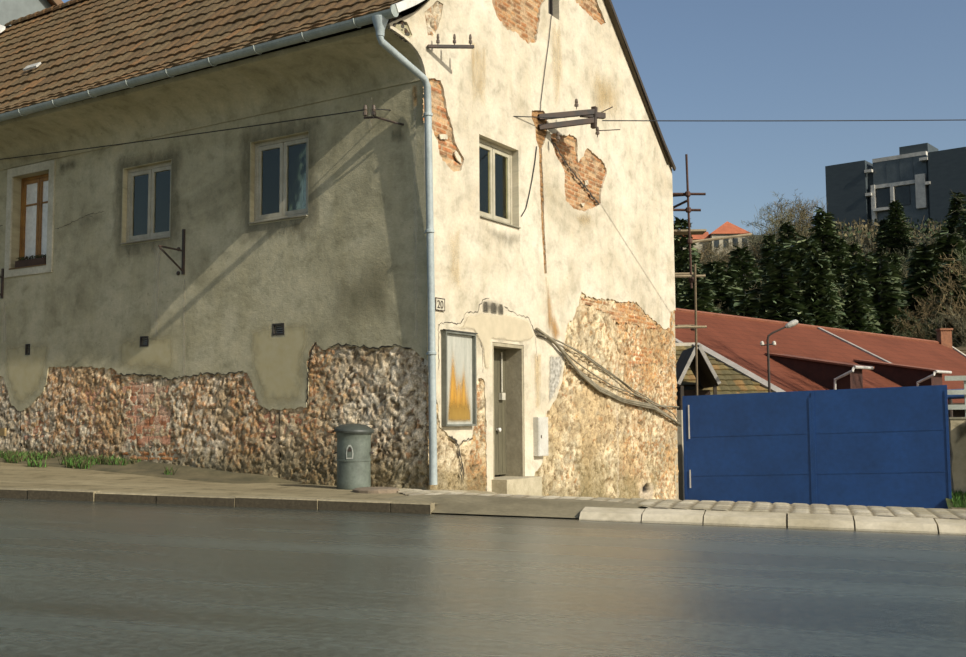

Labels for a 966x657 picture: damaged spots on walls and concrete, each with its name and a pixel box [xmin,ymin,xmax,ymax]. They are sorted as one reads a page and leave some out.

spalling [492,0,543,44]
spalling [575,0,605,25]
spalling [423,79,463,171]
spalling [551,133,605,211]
spalling [0,342,487,491]
spalling [535,293,679,500]